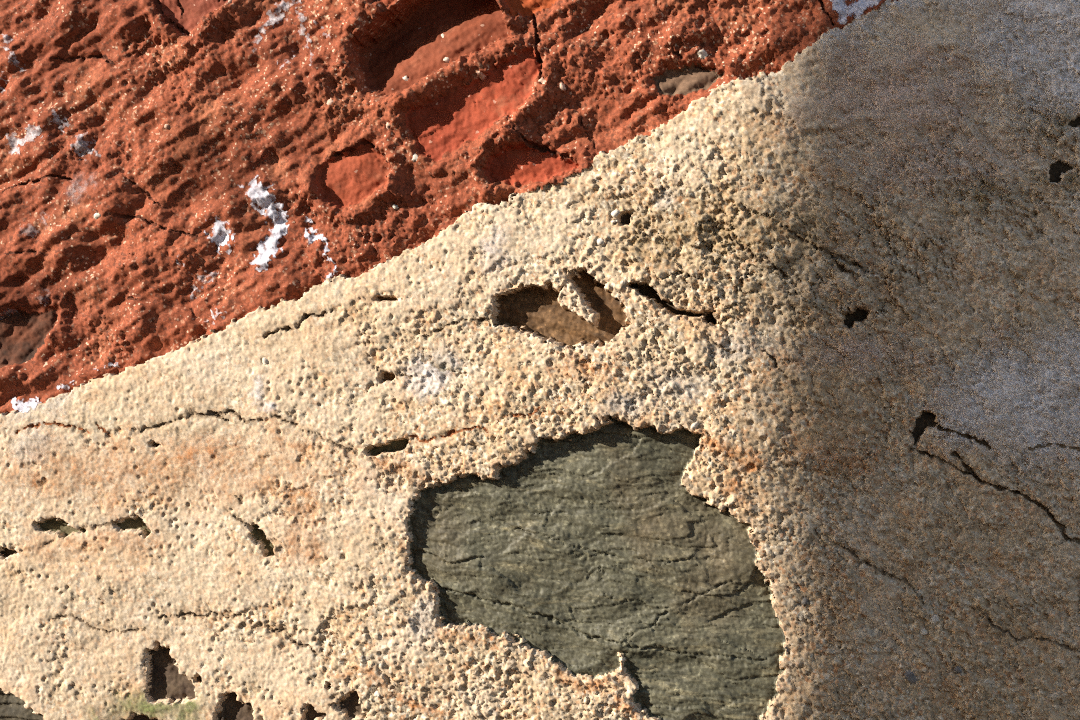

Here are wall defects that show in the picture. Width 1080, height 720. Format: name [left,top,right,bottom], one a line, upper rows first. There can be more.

spalling [346,0,509,100]
flaking render [490,263,631,351]
flaking render [625,280,719,325]
crack [15,421,110,436]
crack [140,409,358,456]
flaking render [361,437,409,457]
crack [910,424,1080,544]
flaking render [31,516,86,539]
flaking render [404,415,789,720]
flaking render [121,640,202,720]
flaking render [0,688,44,720]
flaking render [212,692,264,720]